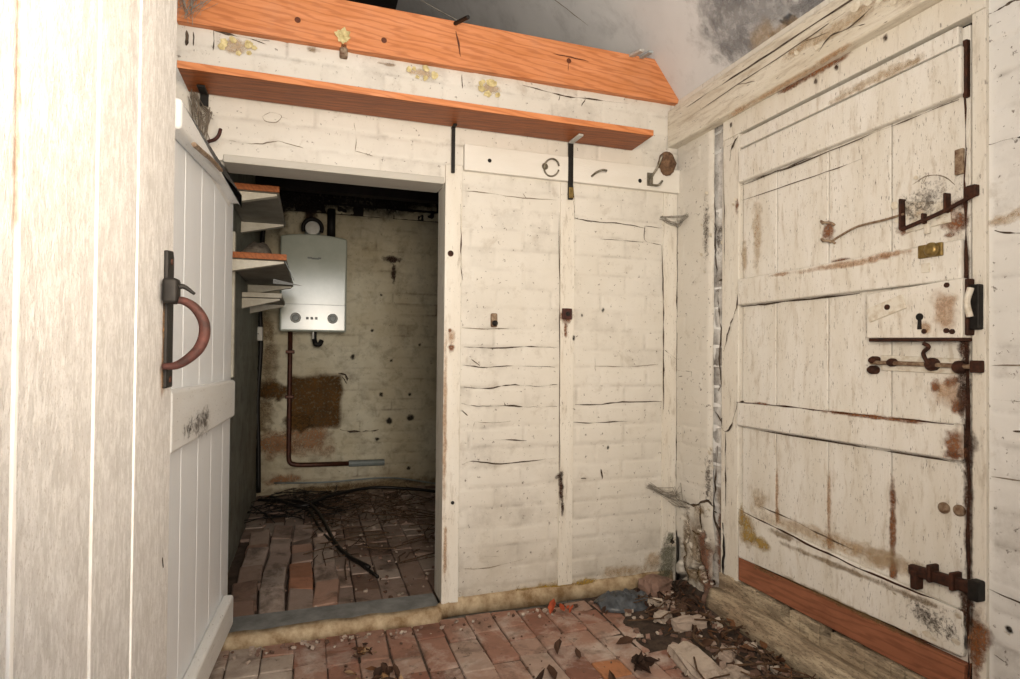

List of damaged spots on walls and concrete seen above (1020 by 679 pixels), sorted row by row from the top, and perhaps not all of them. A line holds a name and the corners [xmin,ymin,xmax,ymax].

crack [687,0,866,111]
corrosion [823,224,833,239]
corrosion [945,202,968,237]
corrosion [931,341,977,579]
water stain [739,508,769,550]
water stain [798,549,878,583]
corrosion [958,591,991,678]